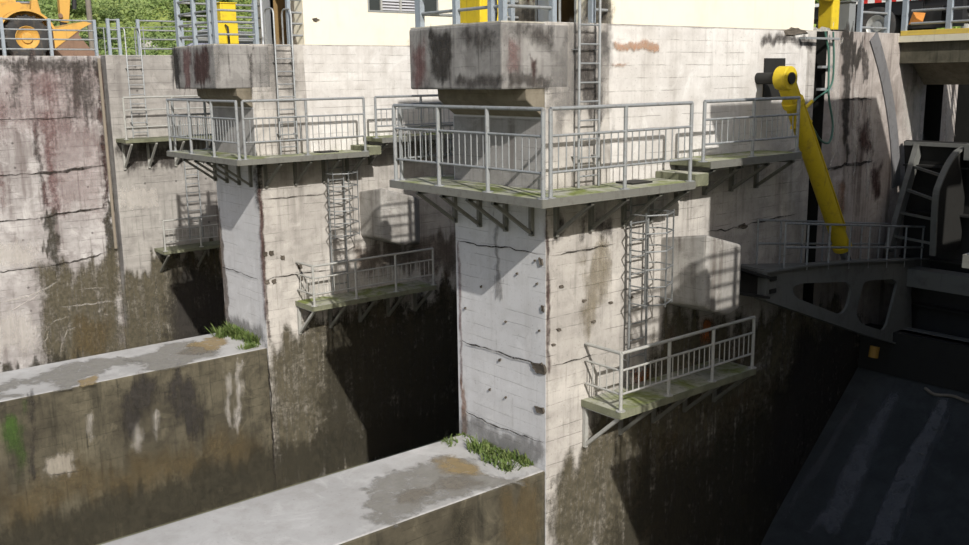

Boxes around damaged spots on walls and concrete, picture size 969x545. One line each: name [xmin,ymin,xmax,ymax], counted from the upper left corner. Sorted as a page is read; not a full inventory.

spalling [614,40,659,52]
leakage [840,21,869,163]
leakage [0,119,226,439]
crack [456,240,612,256]
leakage [0,231,459,545]
crack [463,341,596,366]
leakage [549,306,860,545]